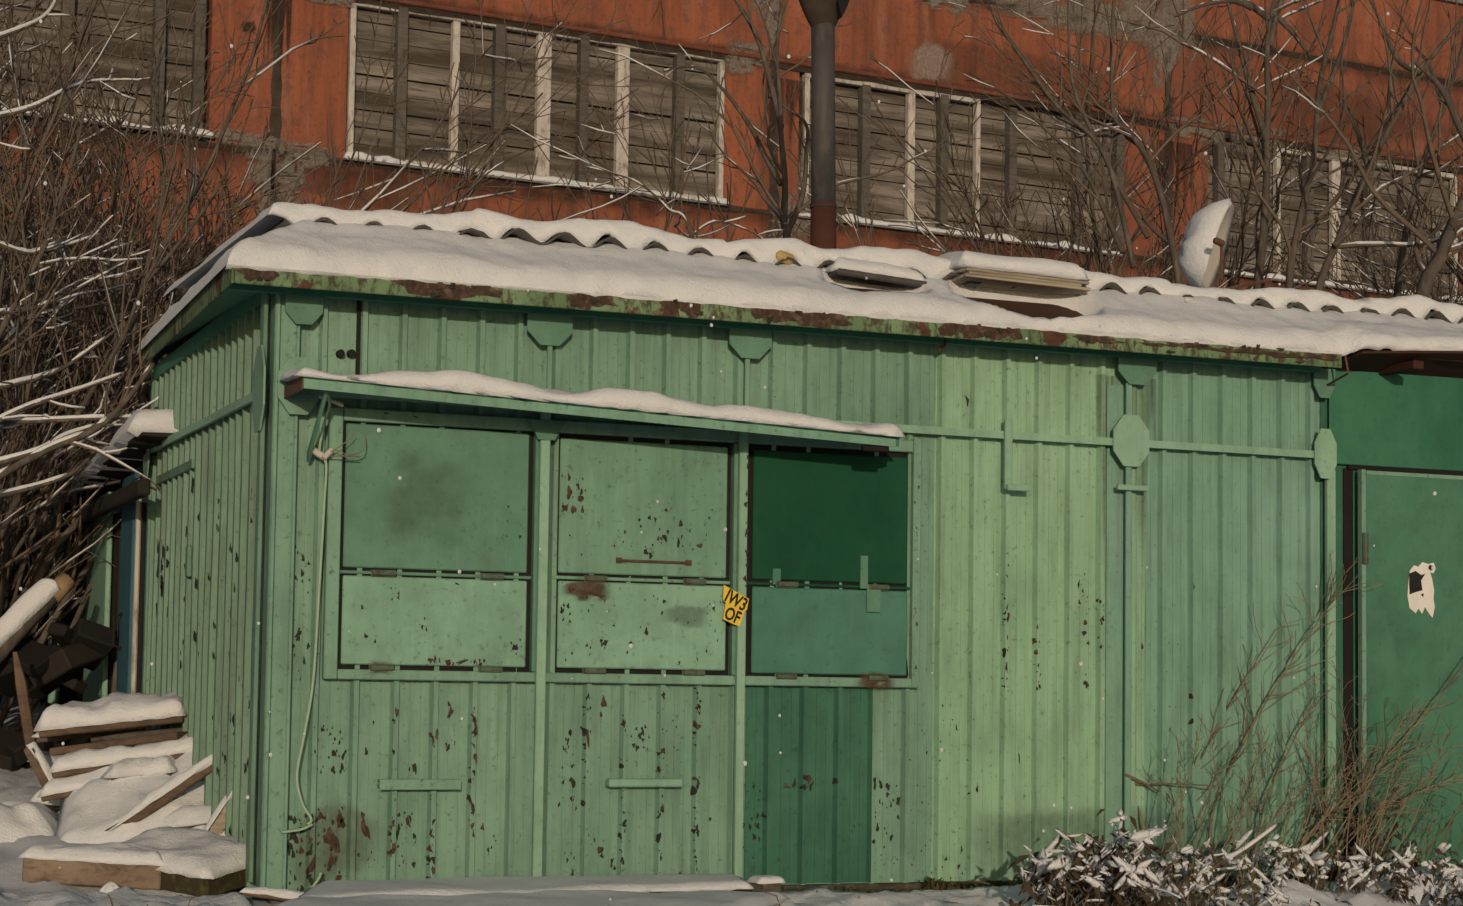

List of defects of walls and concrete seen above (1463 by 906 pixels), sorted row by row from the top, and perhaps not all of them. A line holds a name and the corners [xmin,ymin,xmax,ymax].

spalling [993,0,1195,85]
spalling [210,127,333,215]
corrosion [567,293,619,310]
corrosion [659,299,704,318]
corrosion [751,308,854,328]
corrosion [938,323,1023,340]